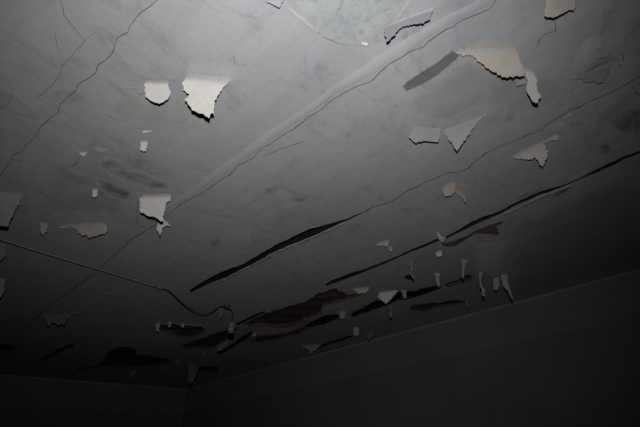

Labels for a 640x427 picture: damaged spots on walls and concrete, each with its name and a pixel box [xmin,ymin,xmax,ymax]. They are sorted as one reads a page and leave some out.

peeling [283,0,434,46]
peeling [544,0,576,18]
crack [0,0,157,175]
peeling [108,58,240,152]
peeling [408,38,566,151]
peeling [510,134,559,167]
peeling [0,192,23,227]
peeling [58,222,107,238]
peeling [139,192,172,235]
peeling [156,151,640,354]